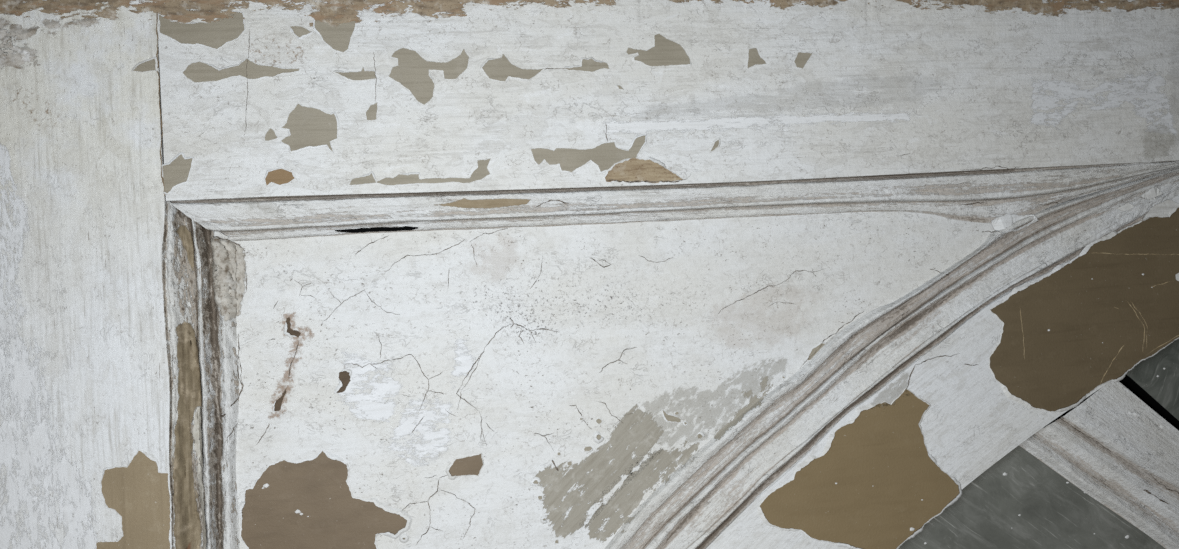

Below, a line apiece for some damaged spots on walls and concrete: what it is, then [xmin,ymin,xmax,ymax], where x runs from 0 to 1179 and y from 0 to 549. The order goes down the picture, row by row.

peeling [333,48,543,105]
peeling [264,103,340,154]
peeling [530,134,647,174]
crack [213,236,247,291]
crack [356,228,507,285]
peeling [989,203,1179,413]
peeling [96,322,207,549]
crack [221,339,270,444]
peeling [238,449,412,549]
crack [274,281,557,440]
crack [404,475,475,543]
peeling [757,388,962,549]